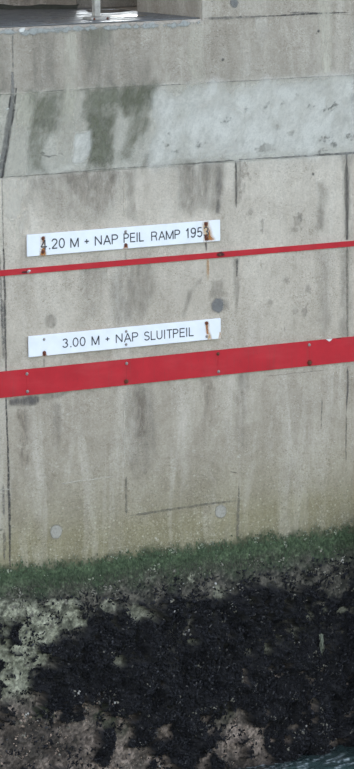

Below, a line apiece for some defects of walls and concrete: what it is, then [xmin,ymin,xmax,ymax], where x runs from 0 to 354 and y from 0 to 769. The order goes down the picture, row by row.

crack [0,72,41,178]
water stain [86,85,157,167]
crack [0,234,8,371]
crack [3,397,11,567]